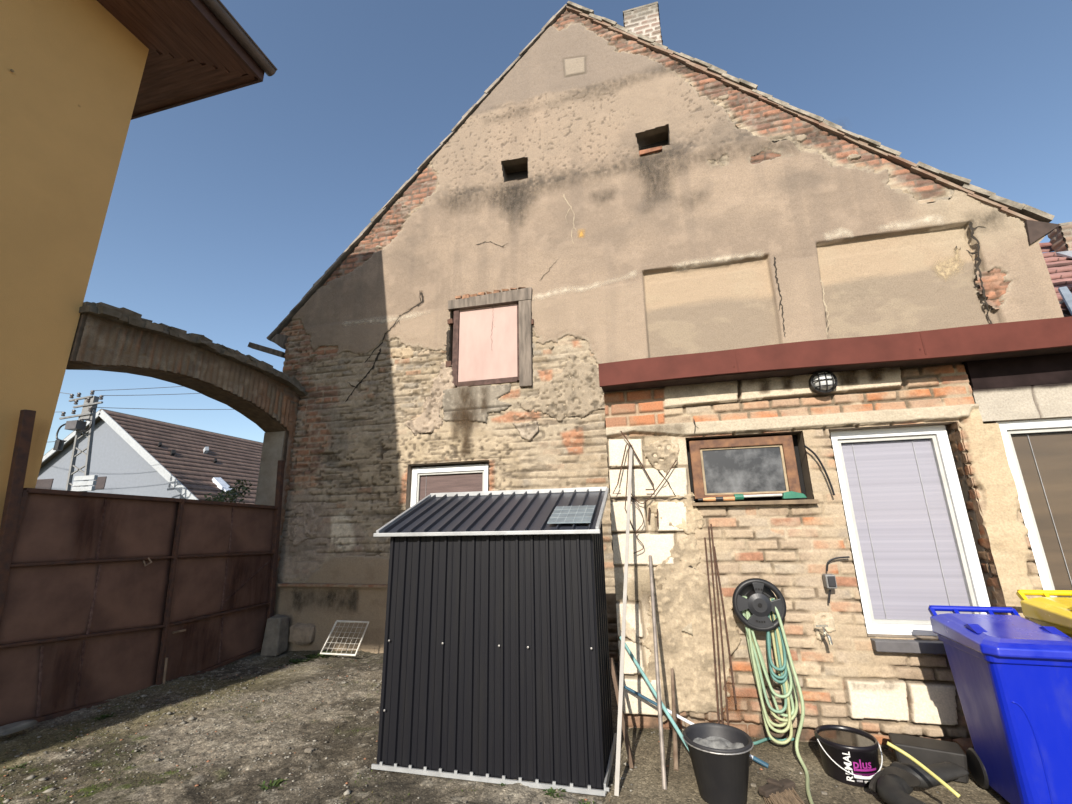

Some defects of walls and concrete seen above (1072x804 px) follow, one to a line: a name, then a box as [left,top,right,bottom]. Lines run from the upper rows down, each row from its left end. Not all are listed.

spalling [552,9,954,204]
spalling [323,164,439,286]
crack [345,291,424,402]
crack [954,221,992,324]
spalling [975,268,1011,309]
spalling [277,319,742,722]